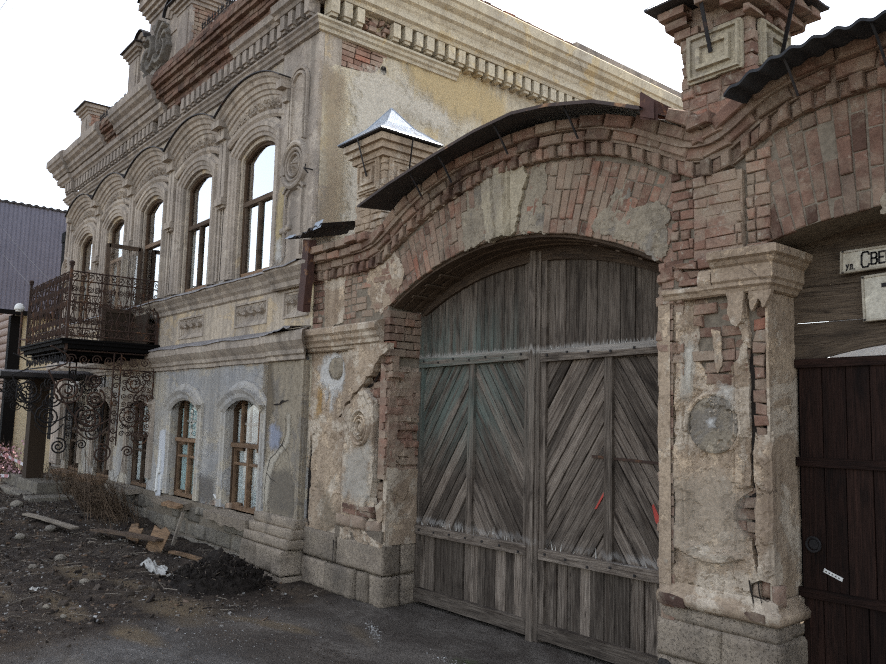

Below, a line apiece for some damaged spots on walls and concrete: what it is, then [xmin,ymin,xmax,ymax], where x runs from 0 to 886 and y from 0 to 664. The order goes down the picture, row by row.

peeling [341,41,451,135]
peeling [342,165,357,235]
spalling [448,193,467,252]
spalling [543,158,610,238]
spalling [674,258,711,287]
spalling [692,289,774,435]
crack [264,400,288,509]
crack [747,340,760,557]
spalling [366,479,395,523]
crack [748,580,769,608]